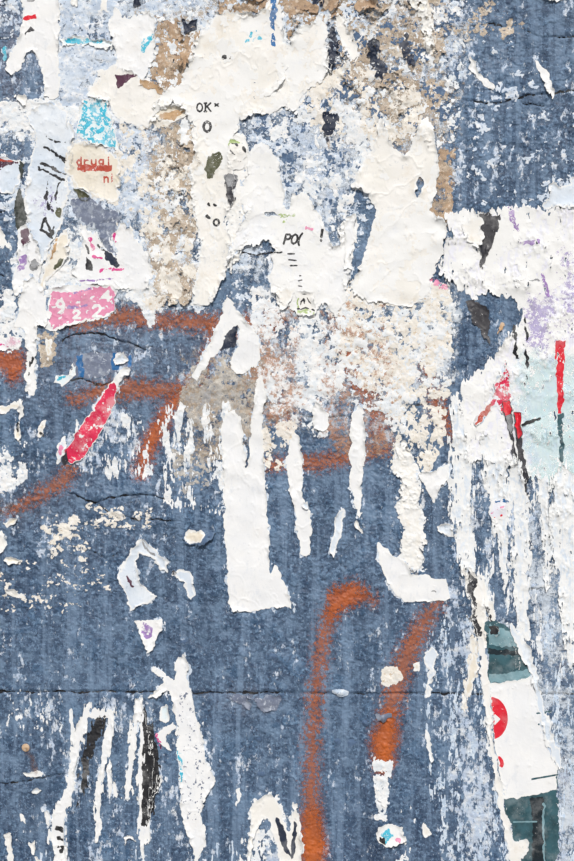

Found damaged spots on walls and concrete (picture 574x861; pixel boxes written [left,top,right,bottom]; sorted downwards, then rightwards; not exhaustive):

peeling [0,289,26,353]
peeling [80,241,459,537]
peeling [0,440,30,494]
peeling [0,502,153,614]
peeling [182,528,216,546]
peeling [473,459,556,604]
peeling [5,689,63,732]
peeling [381,666,403,687]
peeling [413,614,510,861]
peeling [522,589,574,861]
peeling [211,829,278,861]
peeling [372,756,411,861]